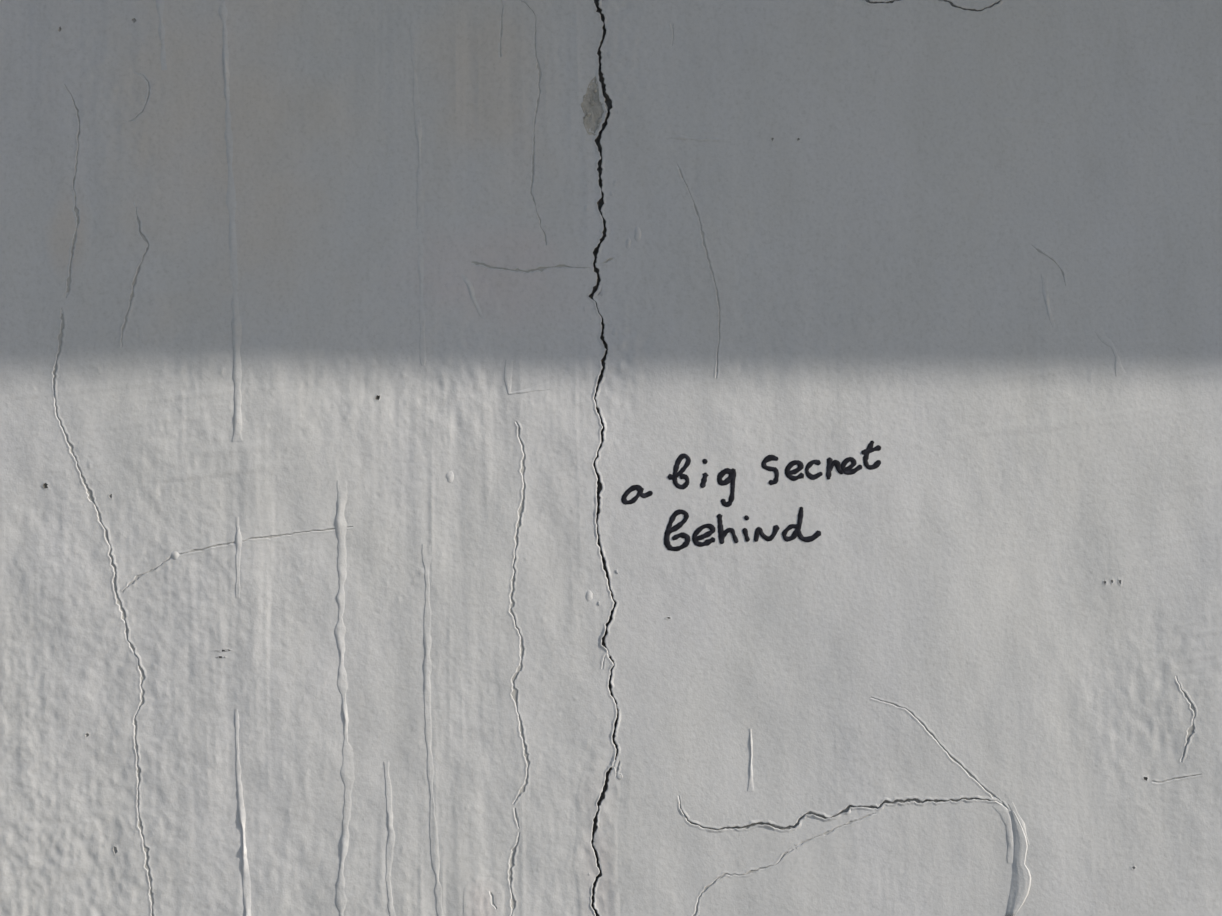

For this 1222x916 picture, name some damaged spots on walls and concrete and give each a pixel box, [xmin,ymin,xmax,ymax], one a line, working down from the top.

crack [858,0,1008,14]
crack [50,83,354,916]
crack [471,0,623,916]
crack [676,695,1010,916]